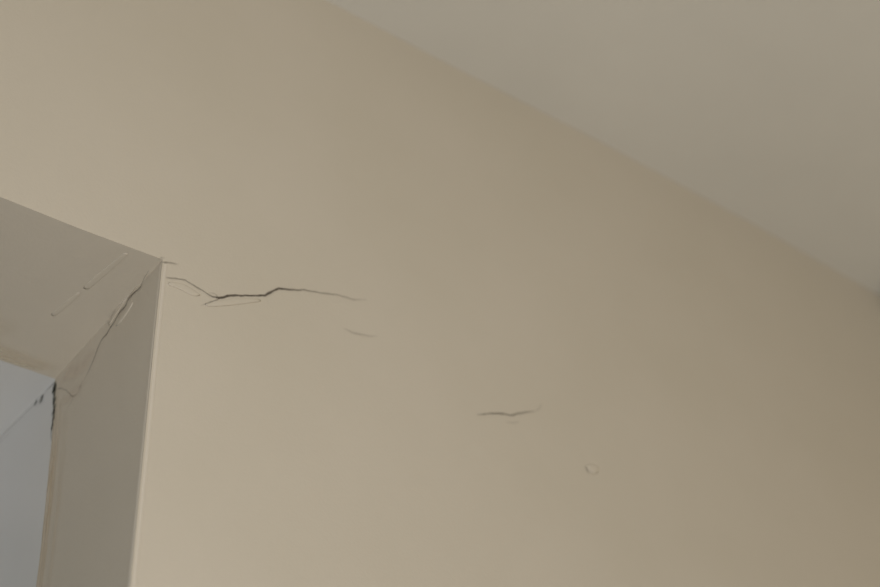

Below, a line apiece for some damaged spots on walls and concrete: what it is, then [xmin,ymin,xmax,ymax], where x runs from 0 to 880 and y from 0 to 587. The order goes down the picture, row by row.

crack [168,282,290,307]